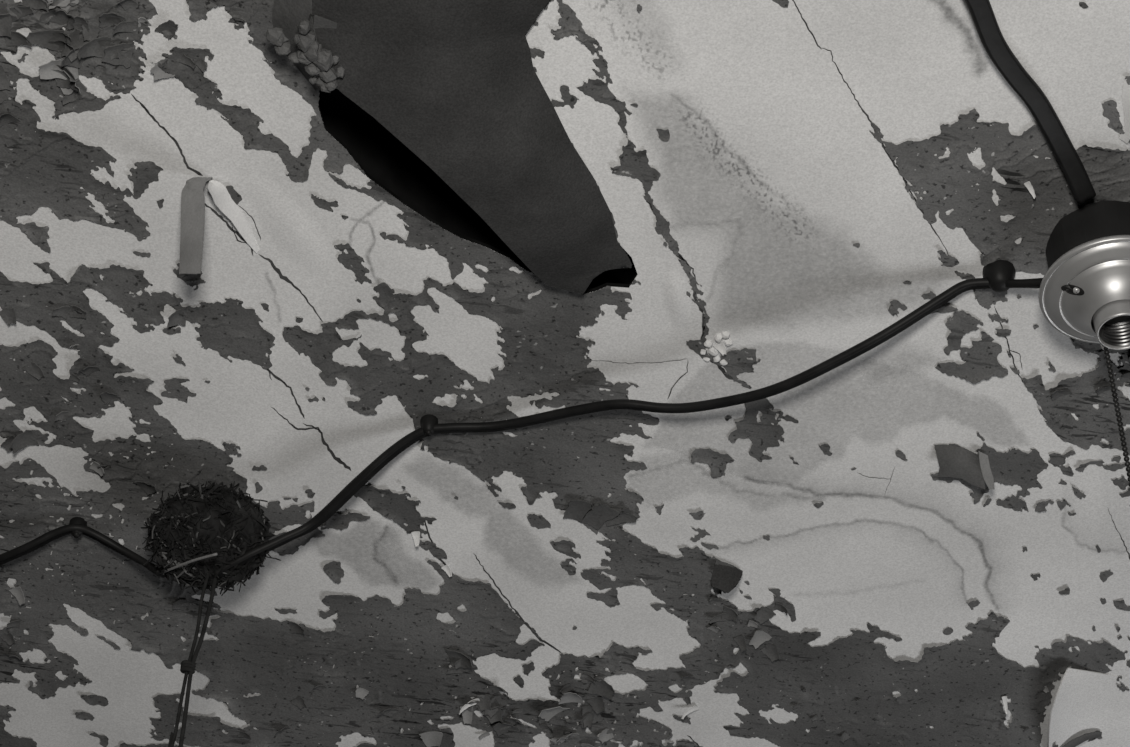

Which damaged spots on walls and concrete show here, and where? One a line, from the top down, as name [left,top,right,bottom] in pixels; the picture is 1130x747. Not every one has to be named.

crack [131,94,203,176]
crack [205,203,323,322]
crack [261,366,351,471]
peeling [0,0,761,430]
peeling [0,262,1130,747]
crack [792,0,948,255]
peeling [869,76,1130,516]